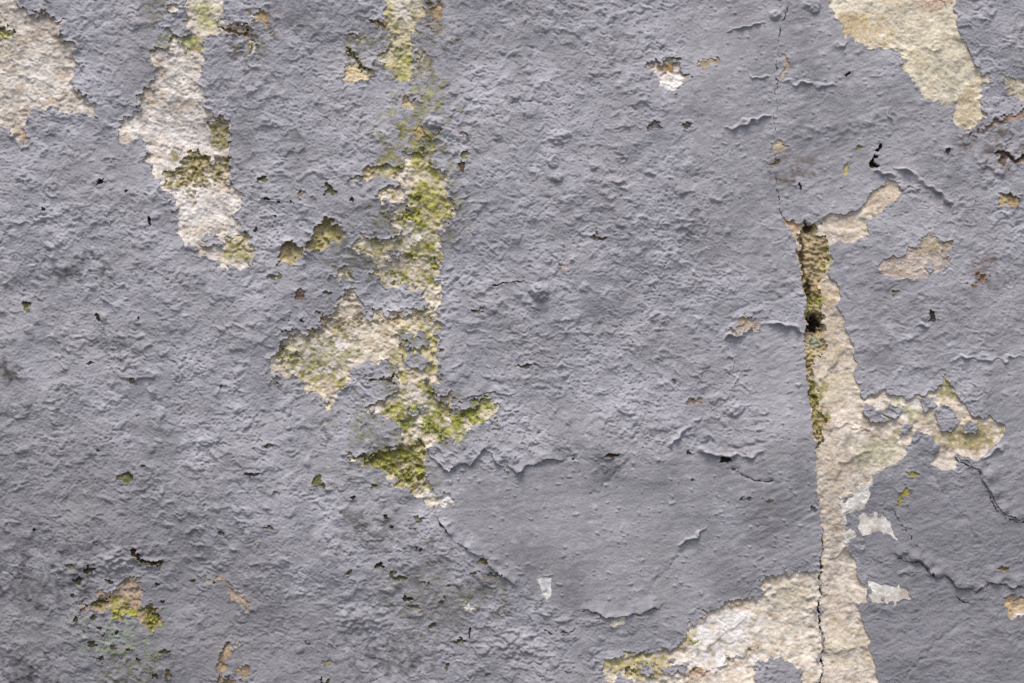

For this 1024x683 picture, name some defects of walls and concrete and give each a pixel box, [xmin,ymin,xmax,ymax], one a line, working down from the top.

peeling [0,0,97,147]
peeling [118,0,269,271]
peeling [341,0,442,84]
peeling [645,57,720,95]
peeling [828,0,1024,138]
peeling [266,125,575,599]
peeling [601,178,1024,683]
peeling [63,564,165,663]
peeling [581,594,666,627]
crack [816,557,824,683]